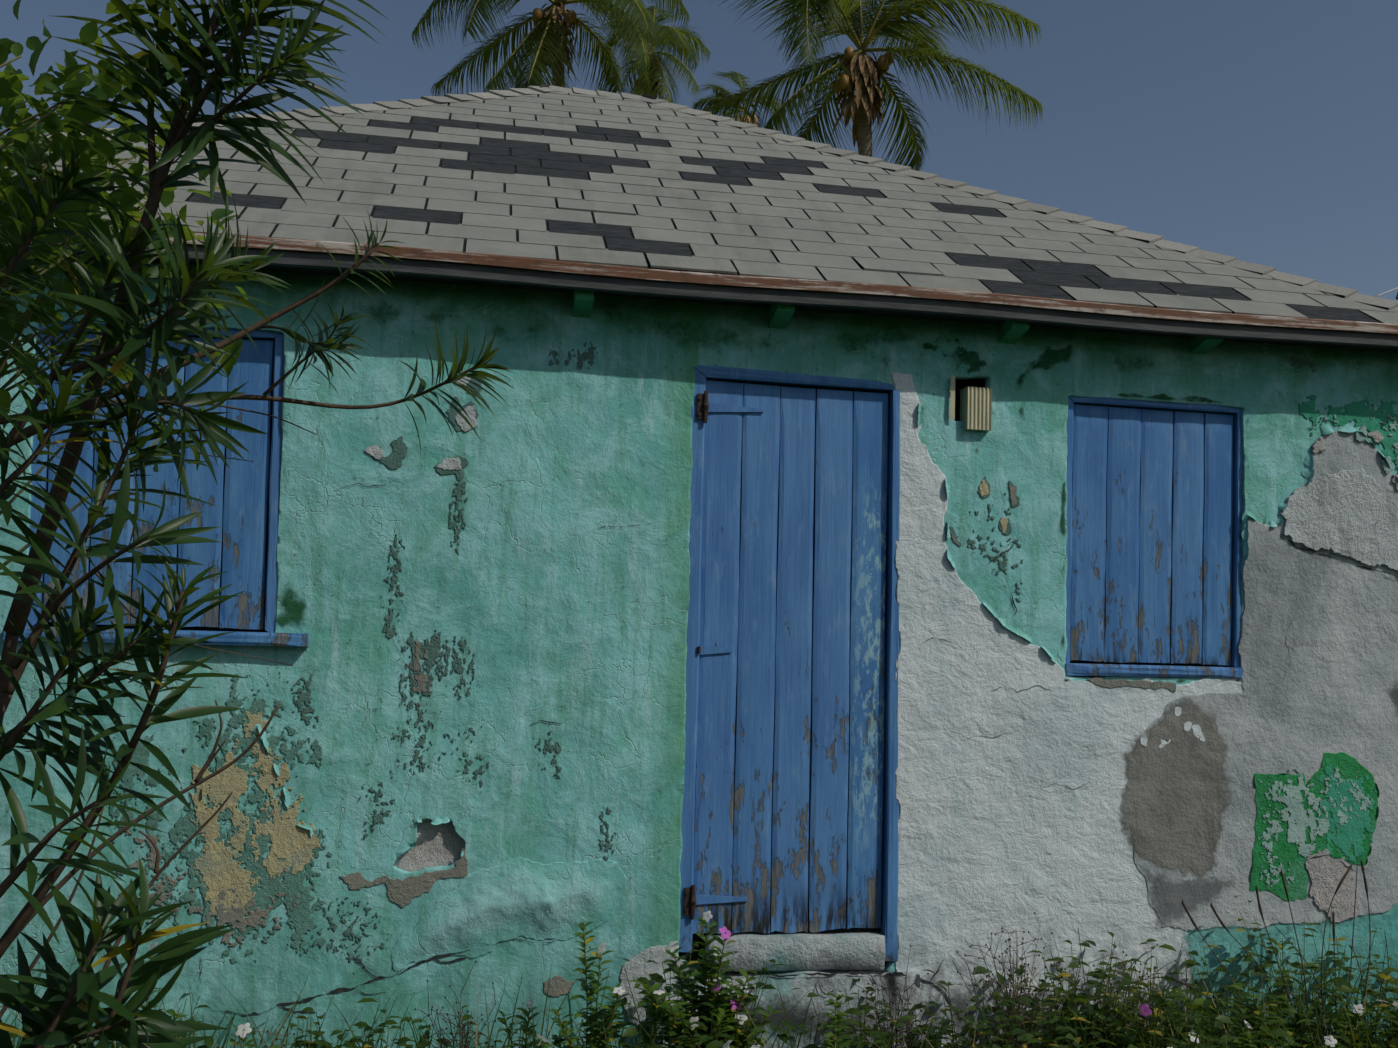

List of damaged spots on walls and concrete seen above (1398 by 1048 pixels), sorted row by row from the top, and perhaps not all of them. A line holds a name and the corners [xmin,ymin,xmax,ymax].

peeling [365,436,408,470]
peeling [434,455,469,555]
peeling [446,376,482,432]
peeling [105,666,468,974]
peeling [358,531,490,840]
peeling [891,372,1398,1048]
leakage [1121,700,1232,924]
crack [200,897,558,1016]